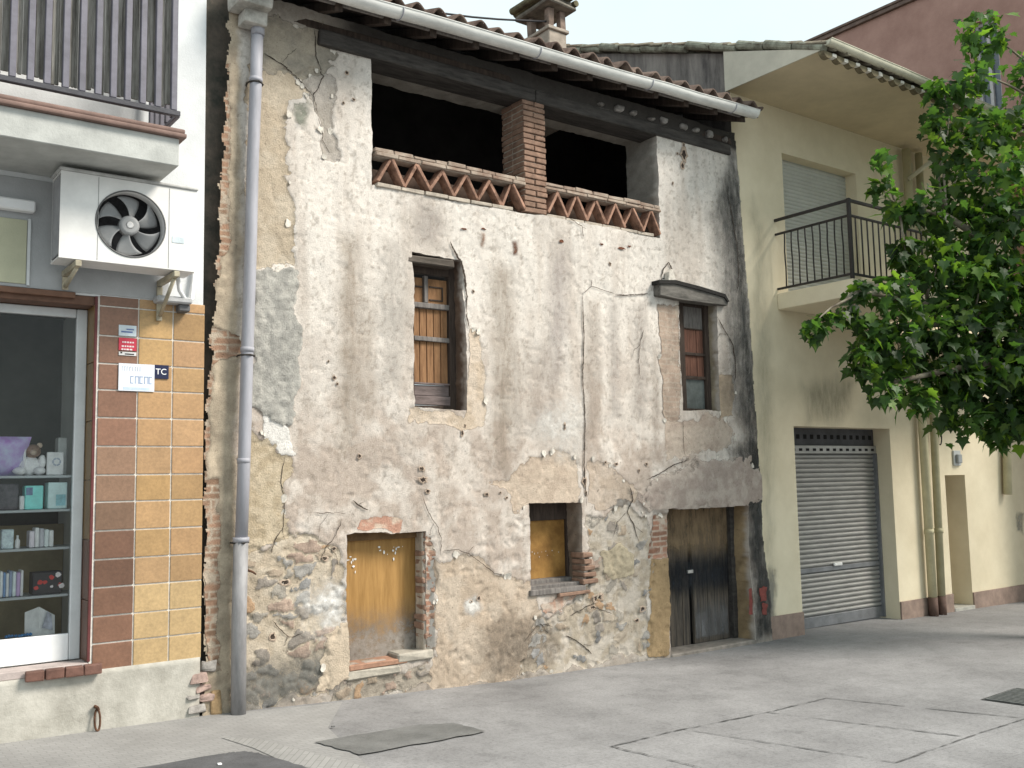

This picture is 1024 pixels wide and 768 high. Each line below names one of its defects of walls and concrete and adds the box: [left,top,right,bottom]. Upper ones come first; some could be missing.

flaking render [214,63,232,286]
crack [267,29,330,153]
peeling [243,14,356,272]
peeling [408,327,489,437]
crack [582,262,672,506]
water stain [721,157,760,471]
flaking render [186,327,241,715]
crack [422,495,502,575]
peeling [424,537,542,690]
peeling [484,447,728,559]
crack [614,426,688,541]
water stain [748,499,772,635]